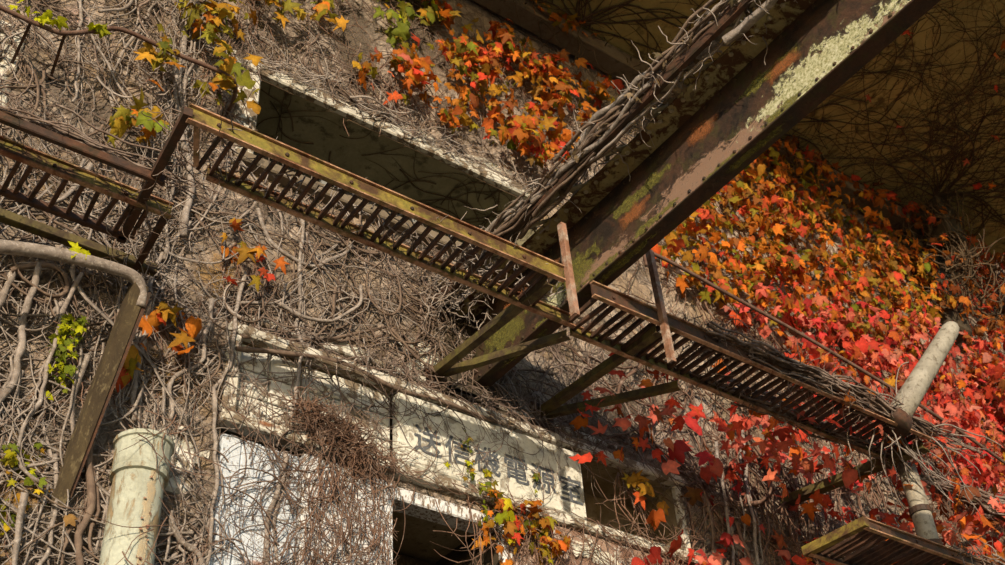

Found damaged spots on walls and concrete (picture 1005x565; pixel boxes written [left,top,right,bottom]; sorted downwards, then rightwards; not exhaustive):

corrosion [847,0,909,54]
corrosion [771,53,799,82]
corrosion [556,95,793,307]